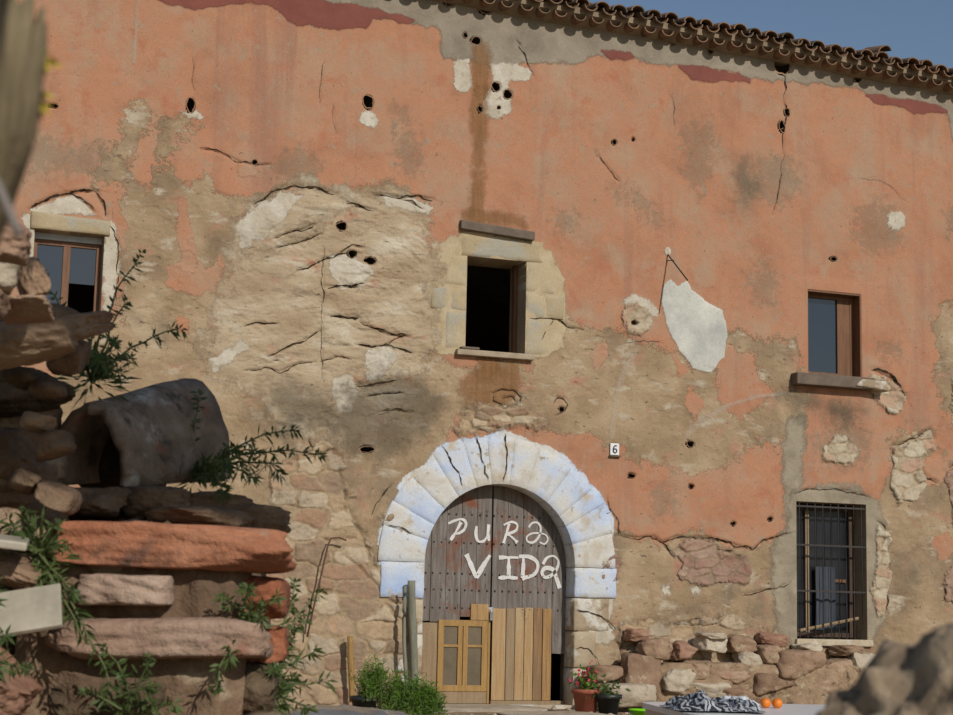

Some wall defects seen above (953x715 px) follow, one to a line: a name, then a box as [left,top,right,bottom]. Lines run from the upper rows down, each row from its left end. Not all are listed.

spalling [491,81,513,110]
crack [30,189,119,300]
peeling [54,97,810,563]
peeling [928,299,953,424]
crack [475,434,508,481]
peeling [862,374,953,654]
peeling [578,526,787,669]